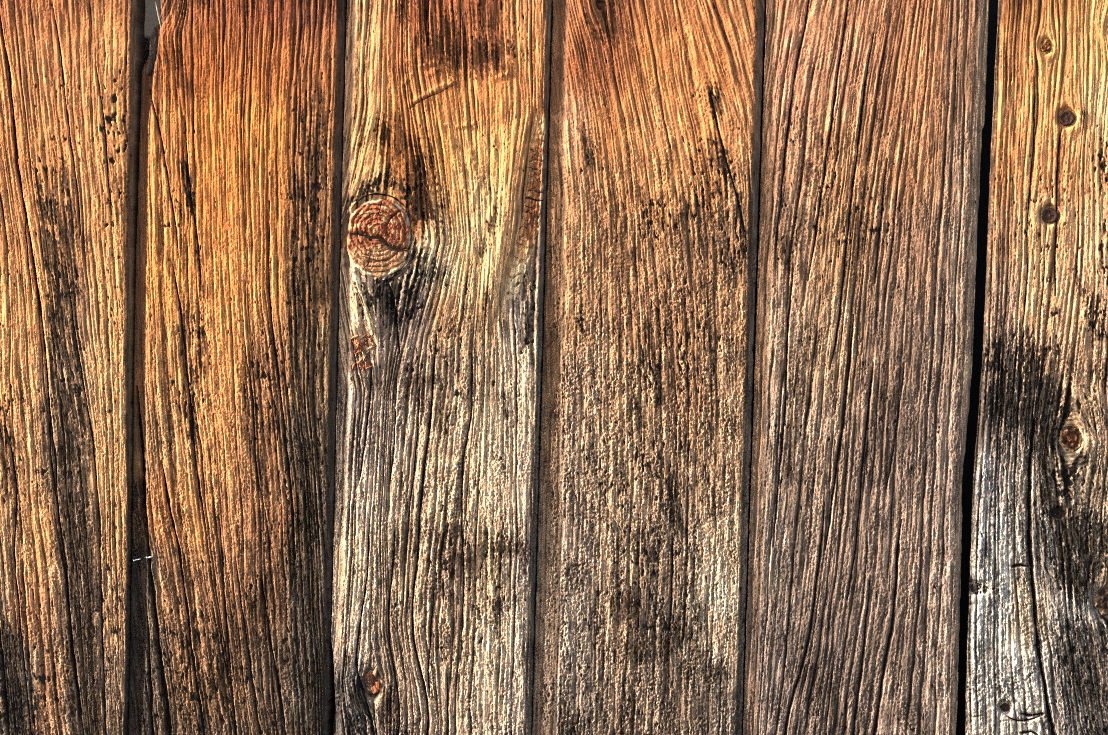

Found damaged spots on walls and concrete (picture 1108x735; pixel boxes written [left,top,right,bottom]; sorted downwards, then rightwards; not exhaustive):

crack [1007,419,1055,735]